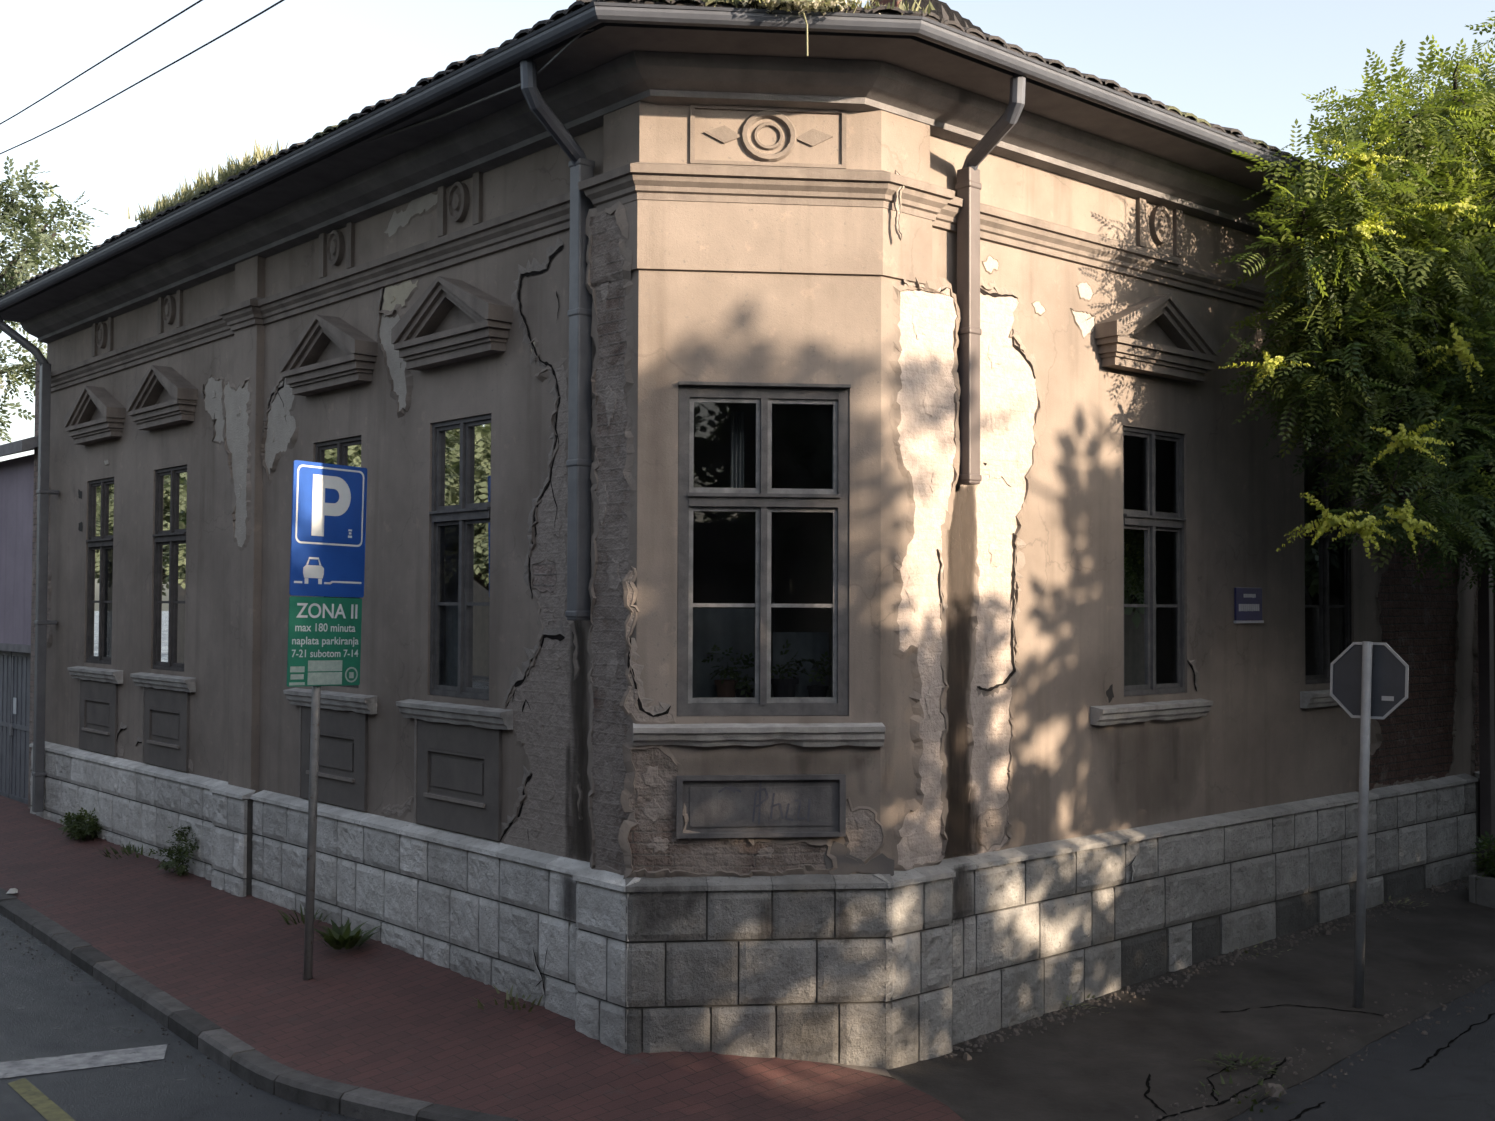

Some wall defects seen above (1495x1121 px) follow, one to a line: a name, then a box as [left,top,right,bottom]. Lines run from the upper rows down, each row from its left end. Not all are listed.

flaking render [376,278,420,418]
flaking render [1070,281,1096,339]
flaking render [203,373,299,551]
crack [504,236,565,712]
flaking render [501,201,1046,879]
flaking render [1356,487,1479,792]
crack [500,766,533,841]